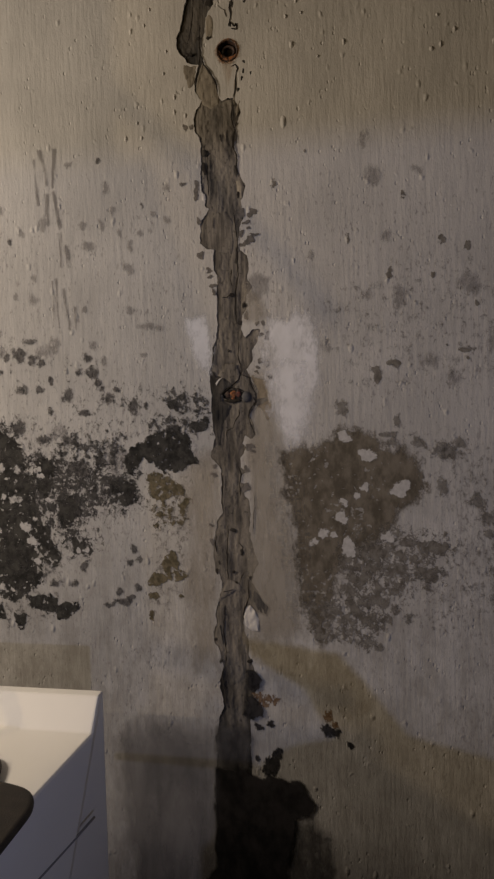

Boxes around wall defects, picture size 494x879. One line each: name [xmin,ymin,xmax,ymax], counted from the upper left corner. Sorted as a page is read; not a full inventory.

spalling [176,0,252,109]
peeling [194,150,208,201]
peeling [236,208,259,247]
peeling [197,251,217,295]
peeling [230,293,269,340]
water stain [0,339,54,374]
spalling [210,358,272,452]
water stain [0,354,213,630]
water stain [252,310,466,653]
water stain [469,492,494,549]